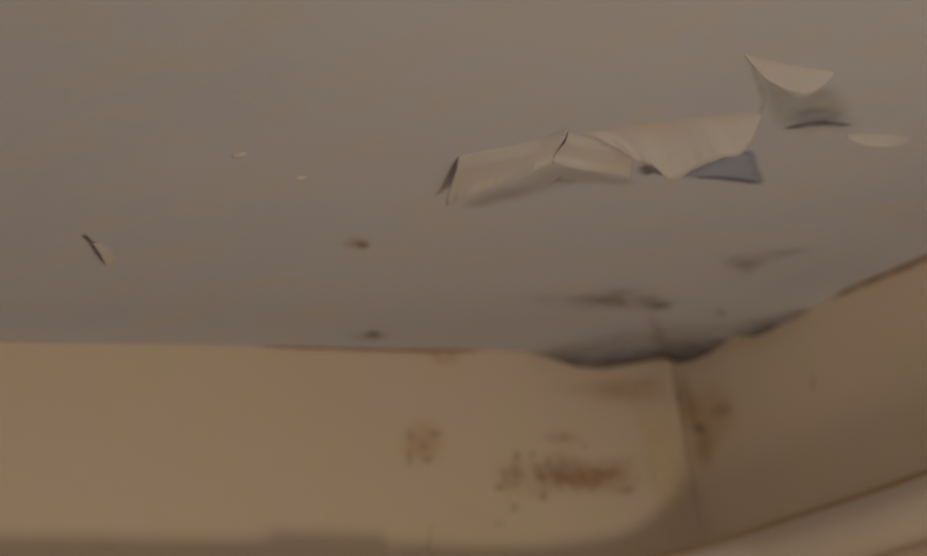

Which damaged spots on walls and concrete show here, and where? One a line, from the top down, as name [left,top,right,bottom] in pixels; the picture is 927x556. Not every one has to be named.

peeling [743,53,834,94]
peeling [446,112,762,206]
crack [84,236,116,266]